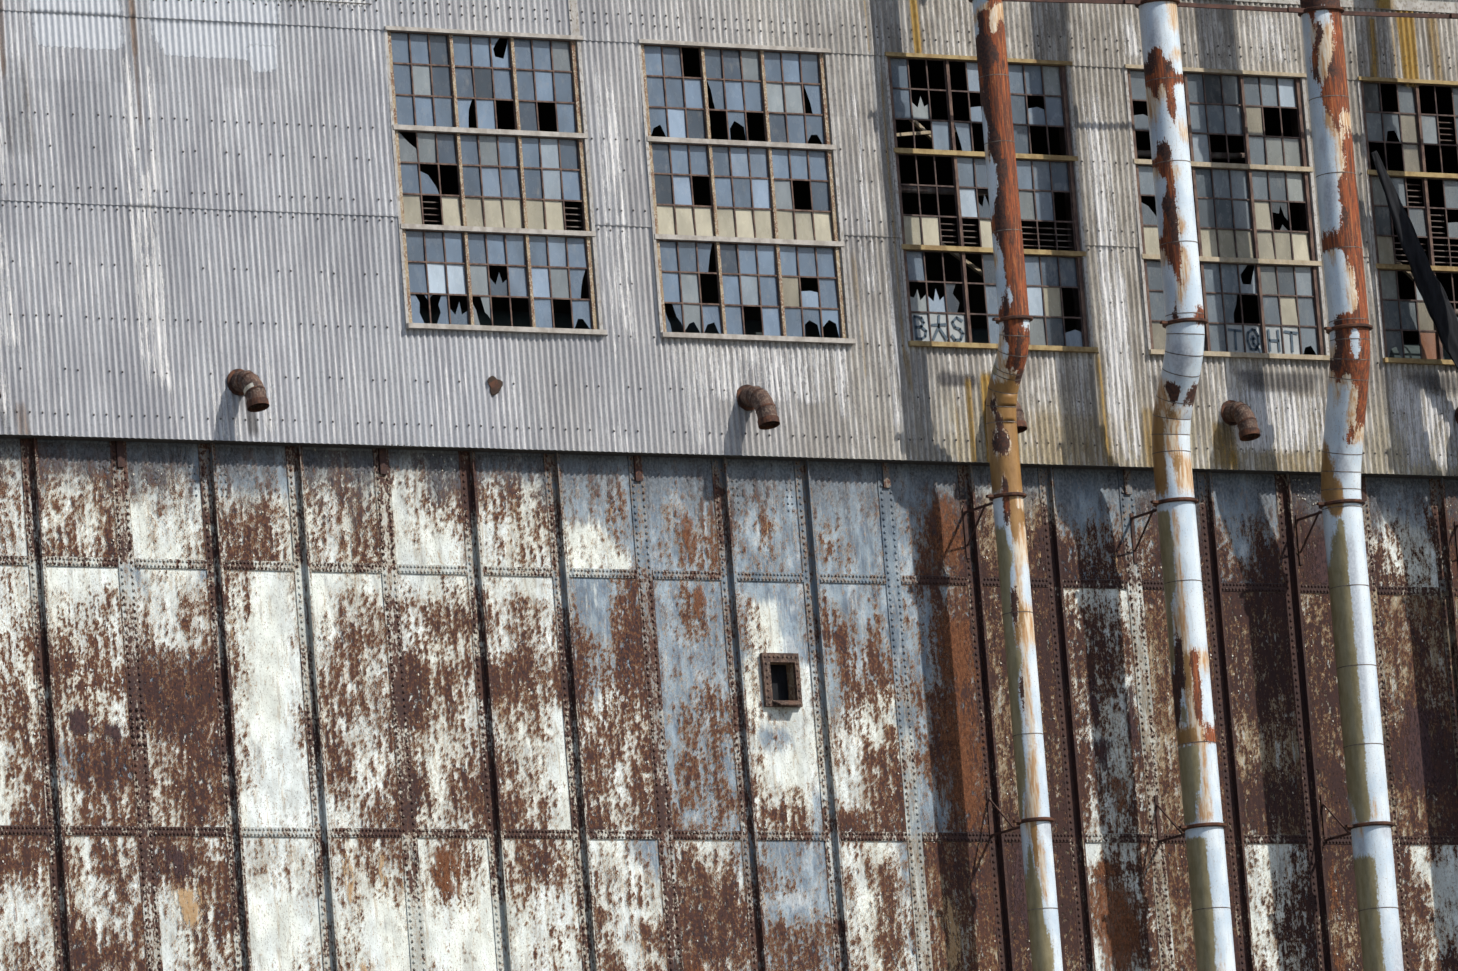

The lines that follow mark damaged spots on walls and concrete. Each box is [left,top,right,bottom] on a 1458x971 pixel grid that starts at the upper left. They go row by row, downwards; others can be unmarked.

corrosion [0,373,1032,971]
corrosion [1195,426,1363,971]